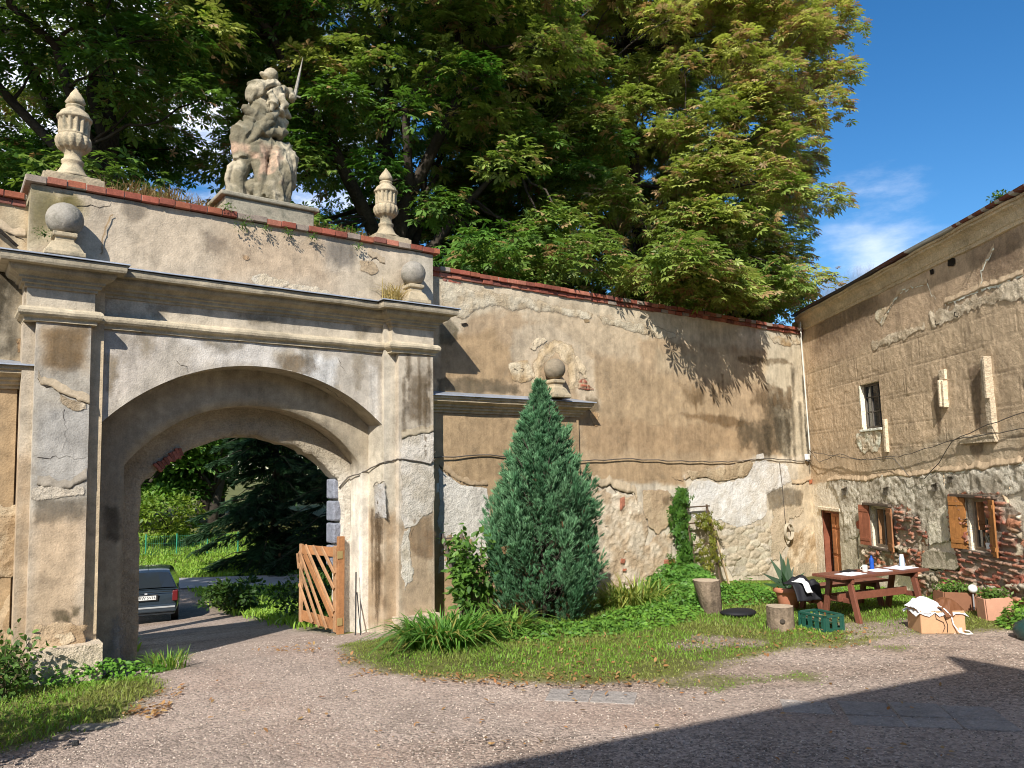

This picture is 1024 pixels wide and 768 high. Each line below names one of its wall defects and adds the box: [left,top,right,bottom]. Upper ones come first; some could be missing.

spalling [439,278,677,339]
spalling [871,243,1024,351]
crack [38,370,90,425]
water stain [403,362,430,421]
spalling [508,360,535,383]
flaking render [578,379,594,390]
flaking render [399,425,490,586]
spalling [585,484,675,588]
flaking render [826,455,1024,597]